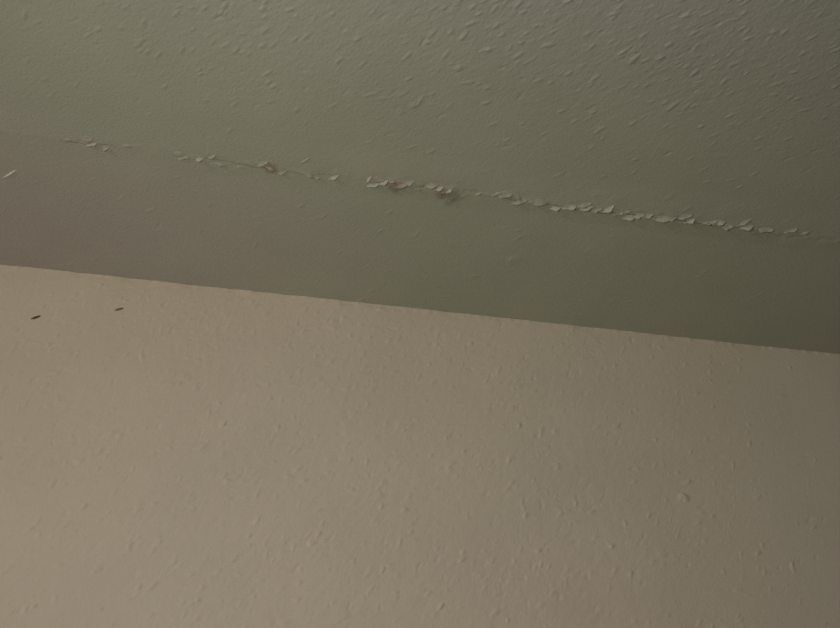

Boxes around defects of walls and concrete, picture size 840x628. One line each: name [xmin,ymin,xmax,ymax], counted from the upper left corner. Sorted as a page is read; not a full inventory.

peeling [475,191,810,237]